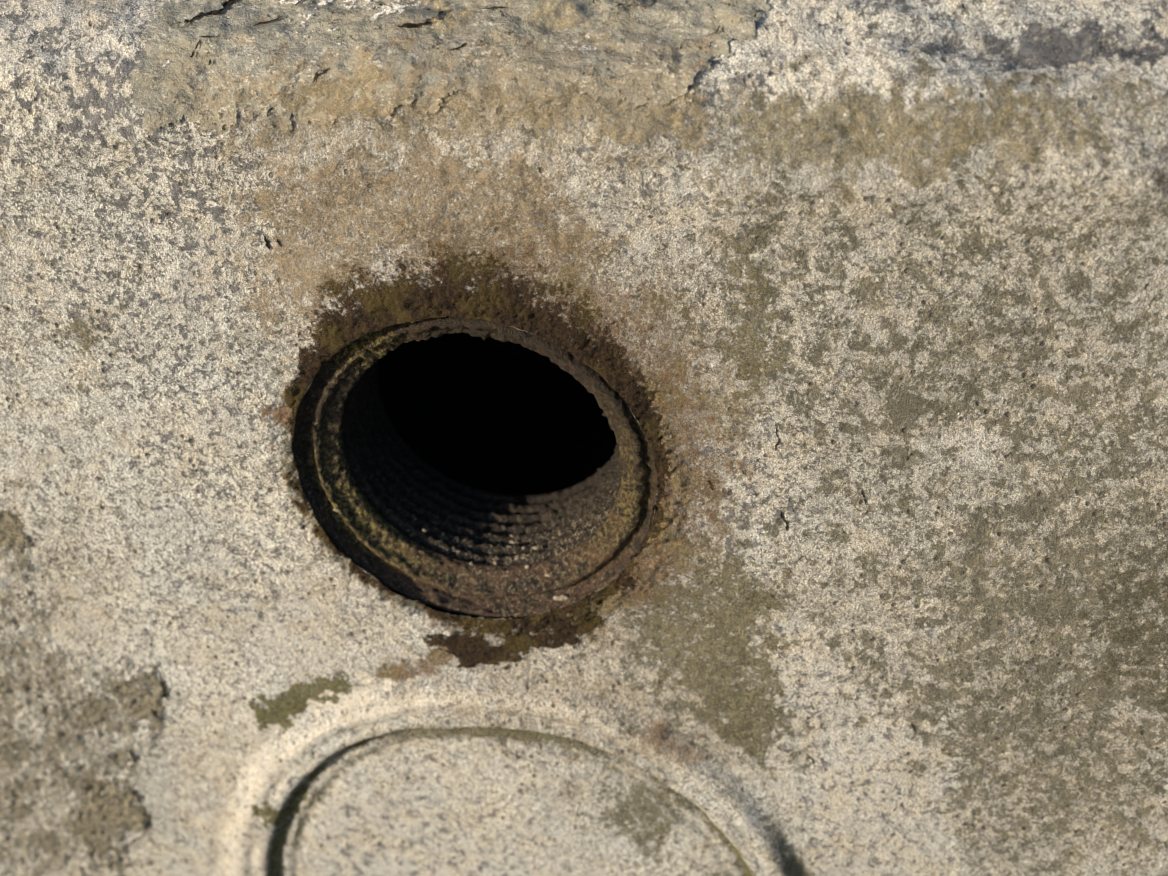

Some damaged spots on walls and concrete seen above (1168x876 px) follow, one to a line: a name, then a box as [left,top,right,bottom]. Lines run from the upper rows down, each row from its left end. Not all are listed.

crack [170,0,237,49]
crack [254,0,302,26]
peeling [129,0,785,140]
corrosion [261,231,754,682]